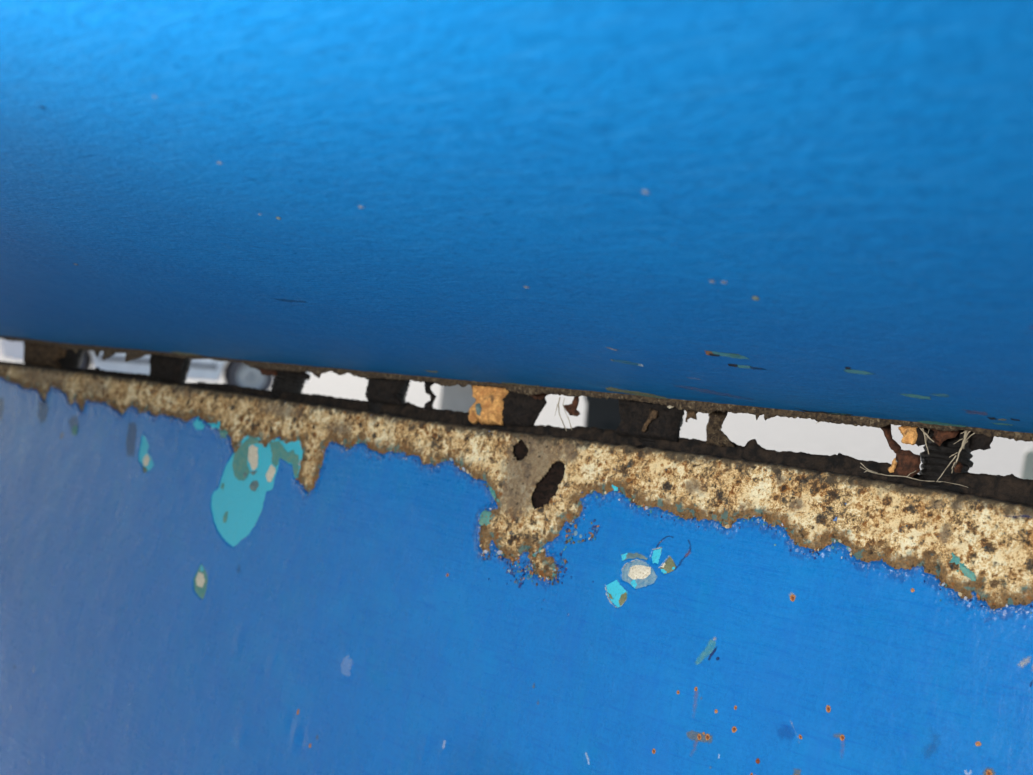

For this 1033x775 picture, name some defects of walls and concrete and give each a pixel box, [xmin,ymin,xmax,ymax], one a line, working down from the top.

peeling [139,435,154,472]
peeling [193,416,303,547]
rust [0,336,1033,614]
peeling [193,564,208,599]
peeling [605,547,676,608]
peeling [948,552,976,581]